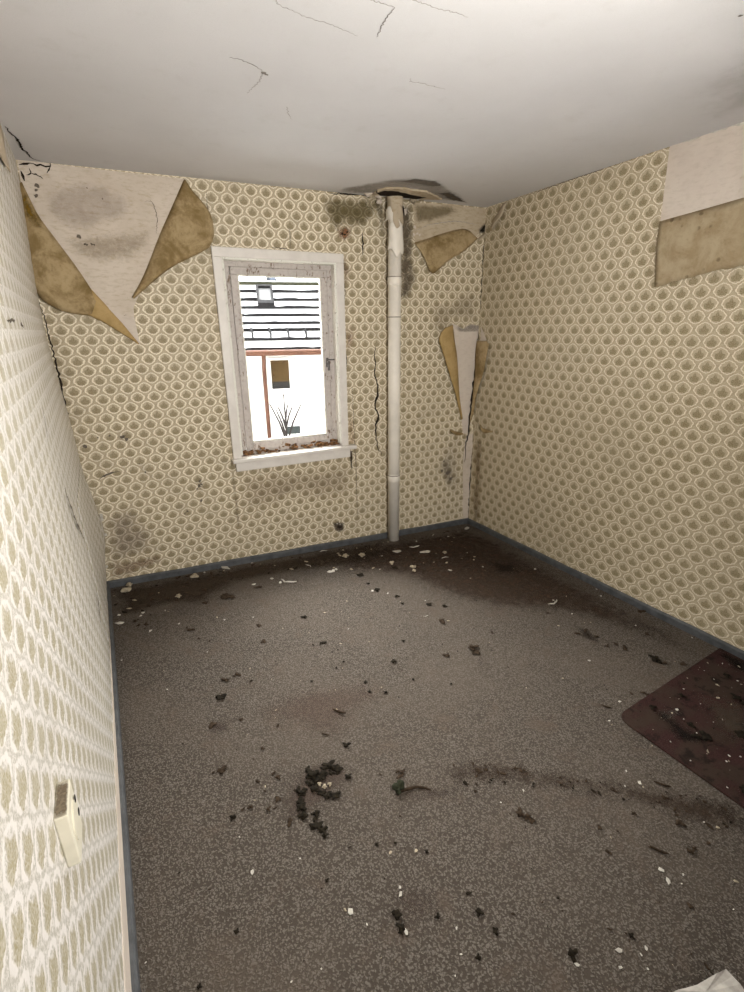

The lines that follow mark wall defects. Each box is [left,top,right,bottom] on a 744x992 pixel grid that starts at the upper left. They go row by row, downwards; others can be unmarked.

crack [276,0,465,37]
water stain [329,201,382,224]
flaking render [364,179,464,215]
crack [374,347,382,455]